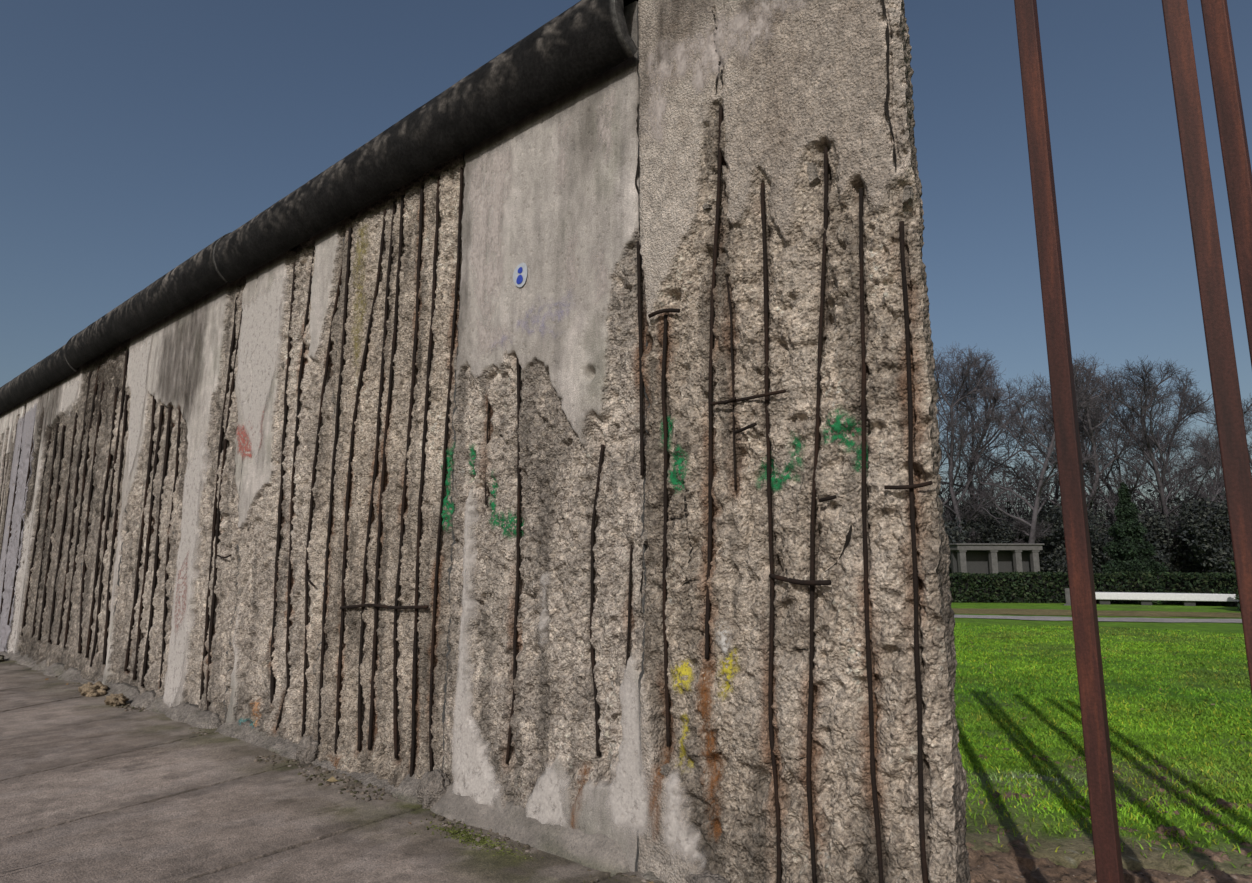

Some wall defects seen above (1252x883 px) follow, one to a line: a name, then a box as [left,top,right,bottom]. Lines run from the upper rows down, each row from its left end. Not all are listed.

spalling [0,0,971,883]
rust [697,667,721,836]